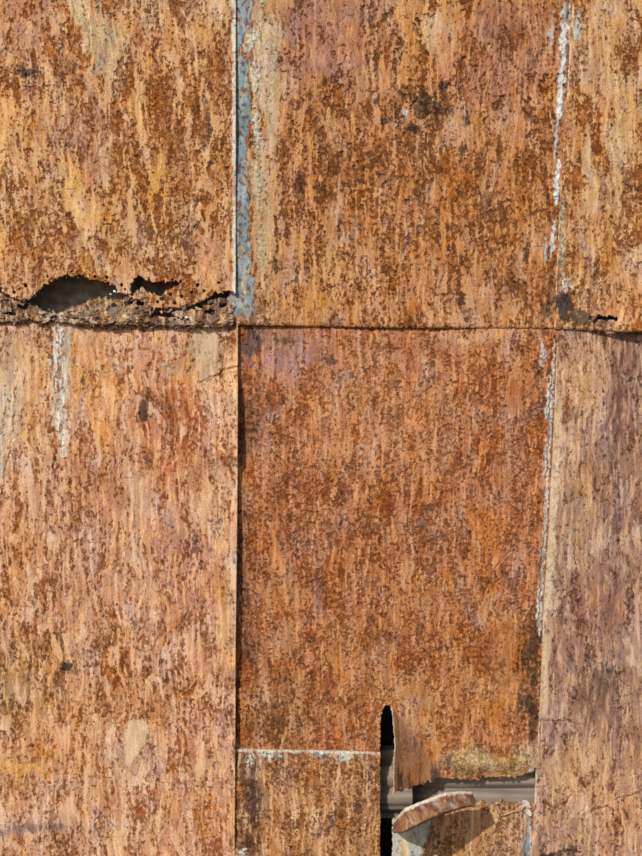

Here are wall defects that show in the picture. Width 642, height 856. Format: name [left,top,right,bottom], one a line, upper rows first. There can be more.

corrosion [13,65,39,78]
corrosion [403,79,451,134]
corrosion [294,172,305,193]
peeling [67,307,115,324]
corrosion [541,290,600,327]
corrosion [240,328,263,357]
leakage [49,322,73,458]
corrosion [138,387,152,421]
corrosion [522,620,542,665]
corrosion [528,691,540,742]
corrosion [243,766,258,849]
peeling [392,817,431,856]